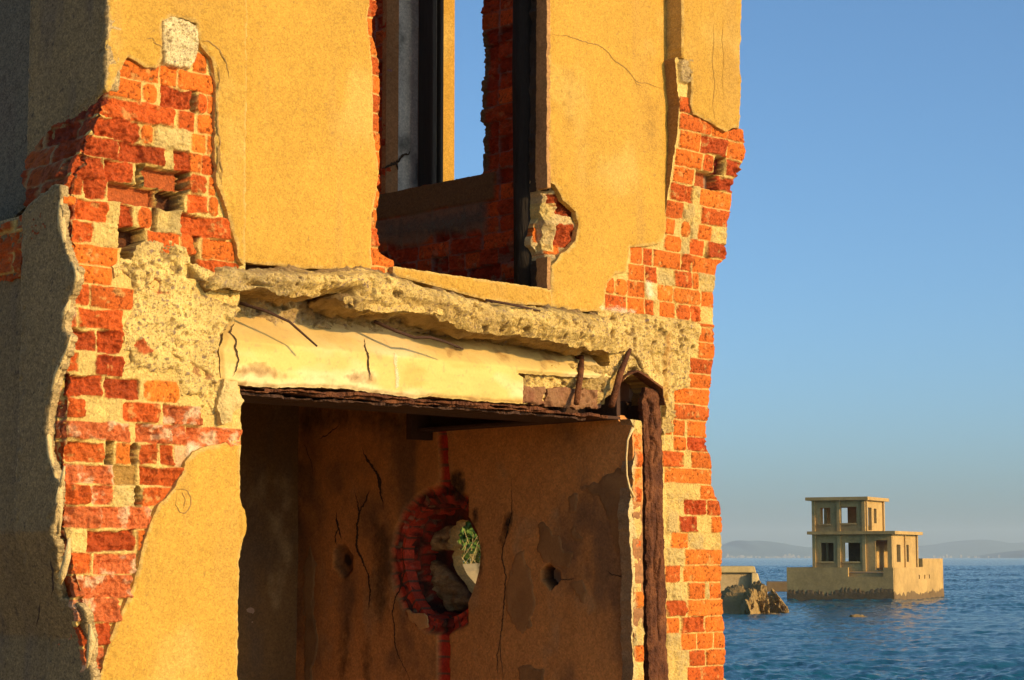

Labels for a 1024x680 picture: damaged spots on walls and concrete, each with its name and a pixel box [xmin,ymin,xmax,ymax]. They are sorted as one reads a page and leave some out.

crack [552,34,665,91]
crack [229,322,239,375]
flaking render [0,0,746,680]
crack [335,448,416,680]
crack [496,481,512,673]